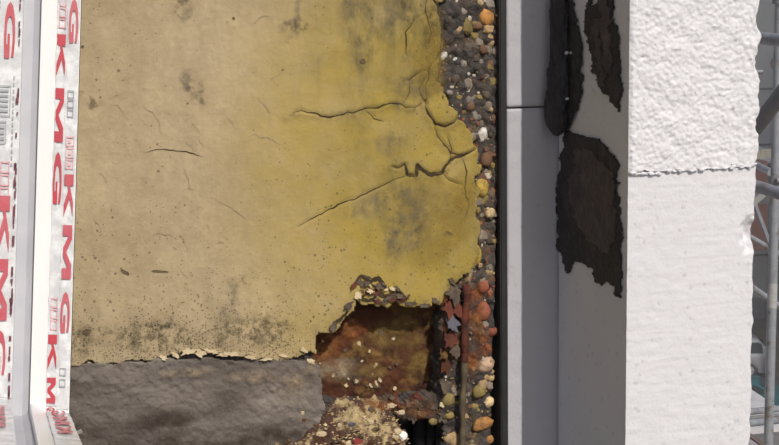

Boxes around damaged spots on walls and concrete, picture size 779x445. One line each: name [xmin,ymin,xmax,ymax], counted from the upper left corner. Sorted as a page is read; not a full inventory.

crack [291,0,475,226]
spalling [300,0,497,445]
peeling [159,348,289,361]